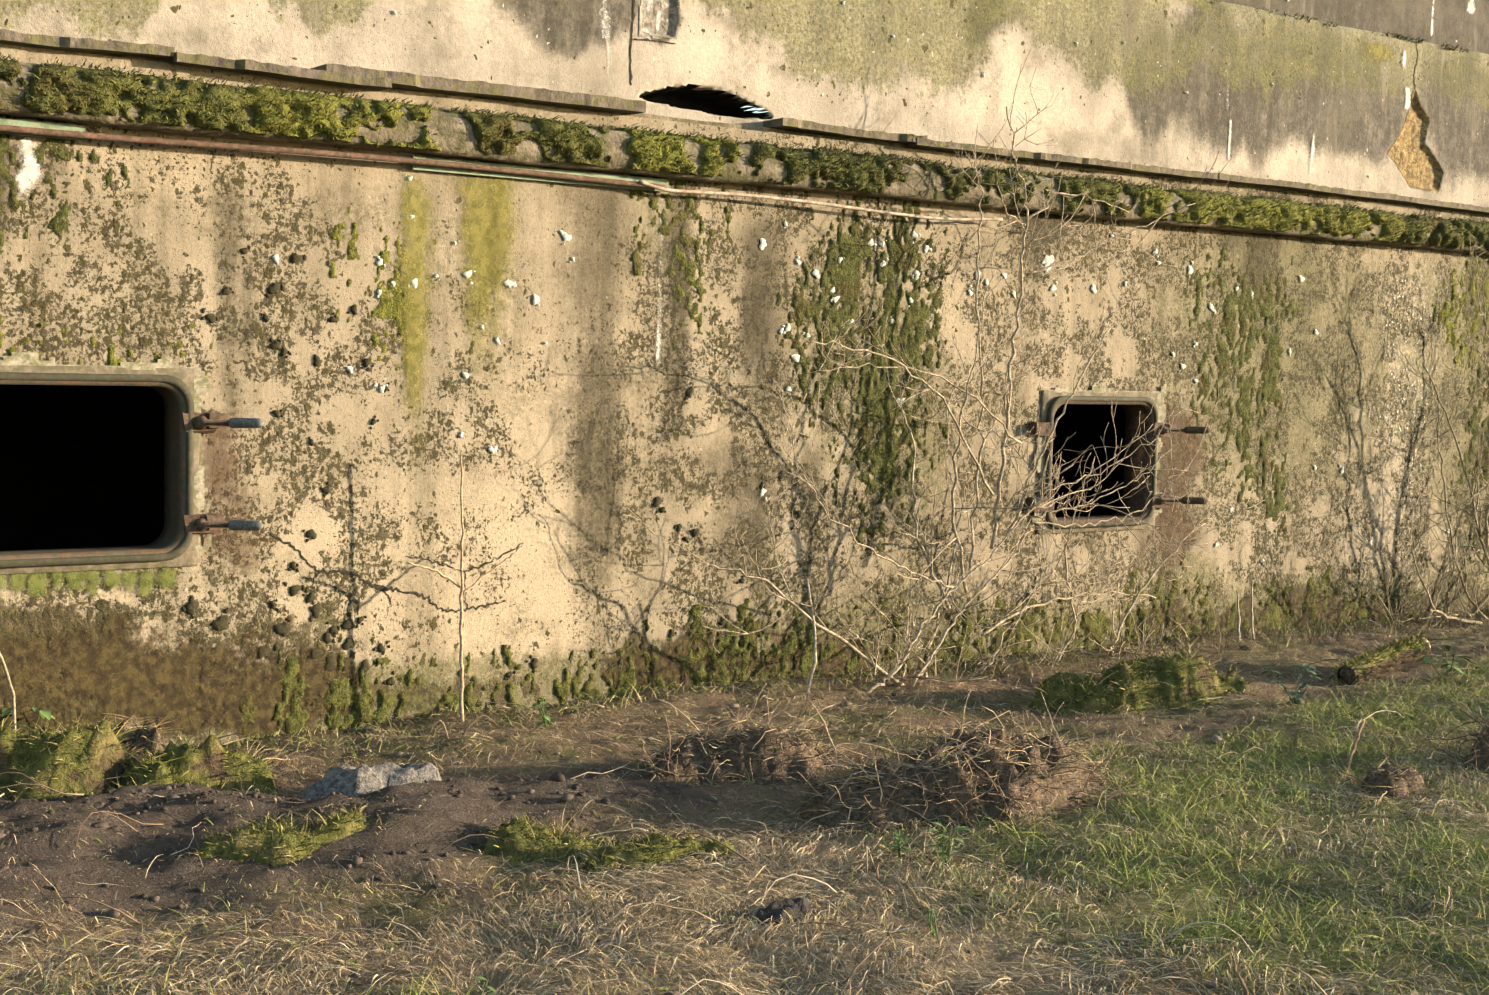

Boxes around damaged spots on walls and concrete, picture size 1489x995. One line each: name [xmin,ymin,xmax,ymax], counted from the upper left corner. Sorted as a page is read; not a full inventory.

efflorescence [641,0,663,35]
water stain [1367,42,1406,68]
hole [639,84,772,119]
spalling [1387,90,1444,193]
rust [204,428,250,565]
rust [1153,404,1202,556]
crack [270,533,523,613]